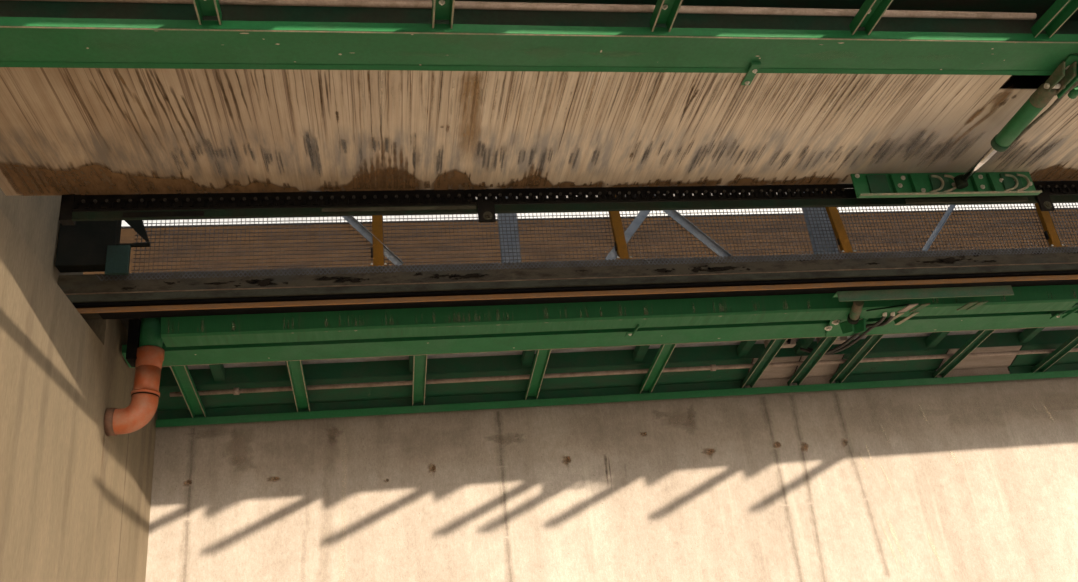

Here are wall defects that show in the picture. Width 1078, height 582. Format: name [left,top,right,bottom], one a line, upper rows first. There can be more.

damp [0,70,848,196]